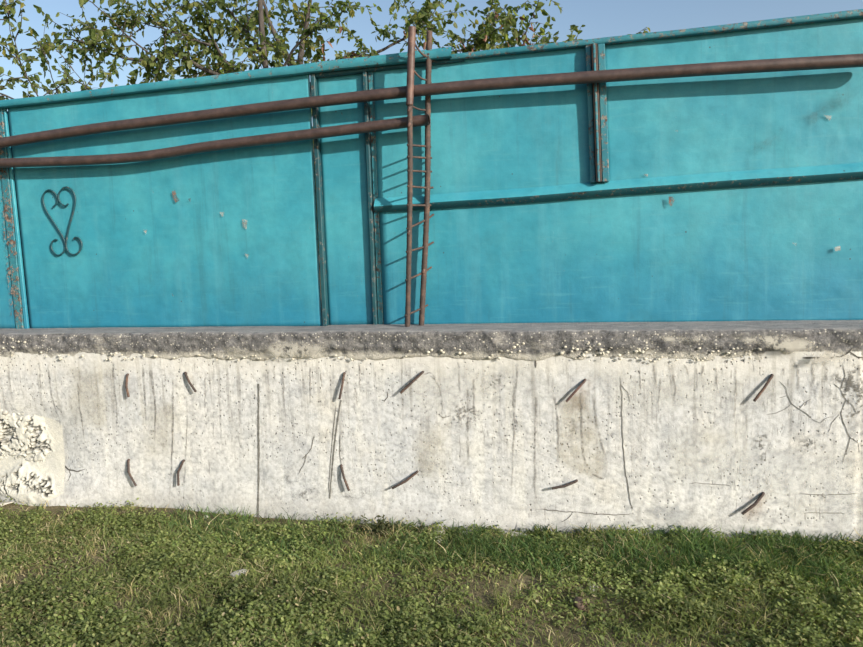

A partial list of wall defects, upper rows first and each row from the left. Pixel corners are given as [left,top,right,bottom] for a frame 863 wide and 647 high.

corrosion [1,188,22,321]
spalling [0,409,64,463]
crack [767,348,863,463]